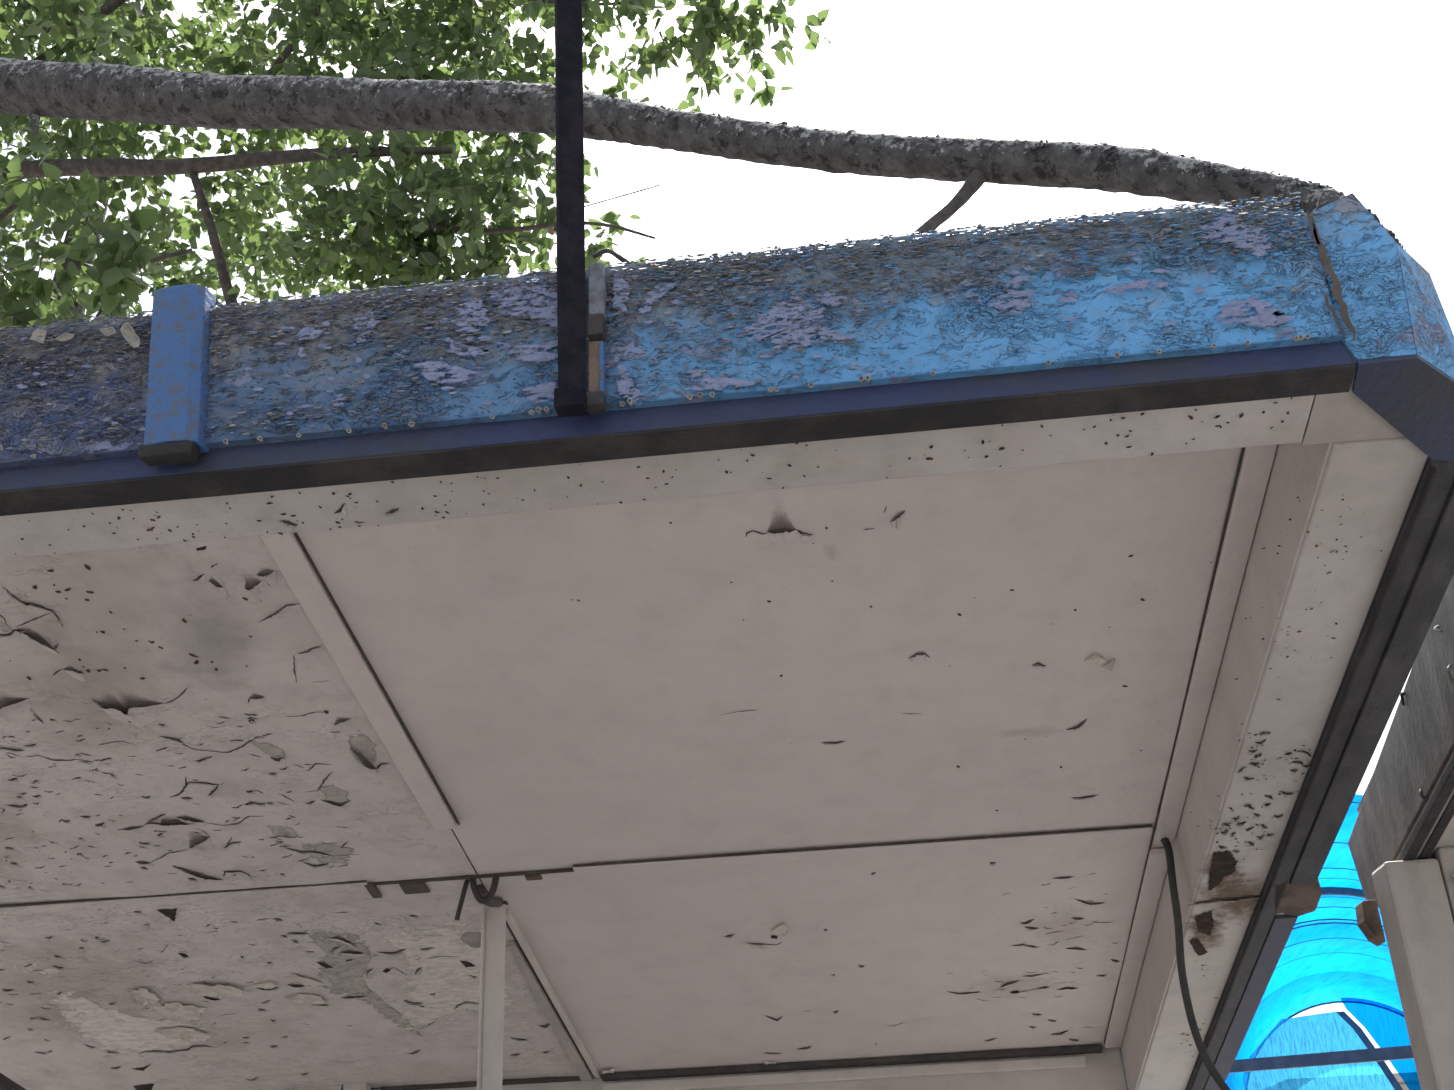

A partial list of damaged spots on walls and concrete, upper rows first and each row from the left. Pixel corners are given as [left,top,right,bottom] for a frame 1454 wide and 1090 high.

peeling [1180,213,1296,270]
peeling [612,272,684,324]
peeling [935,257,1068,319]
peeling [100,322,141,361]
peeling [392,283,558,419]
peeling [681,287,863,400]
peeling [0,613,86,682]
peeling [1190,724,1311,860]
peeling [121,814,355,869]
peeling [134,908,177,927]
corrosion [1215,882,1260,915]
peeling [45,911,485,1090]